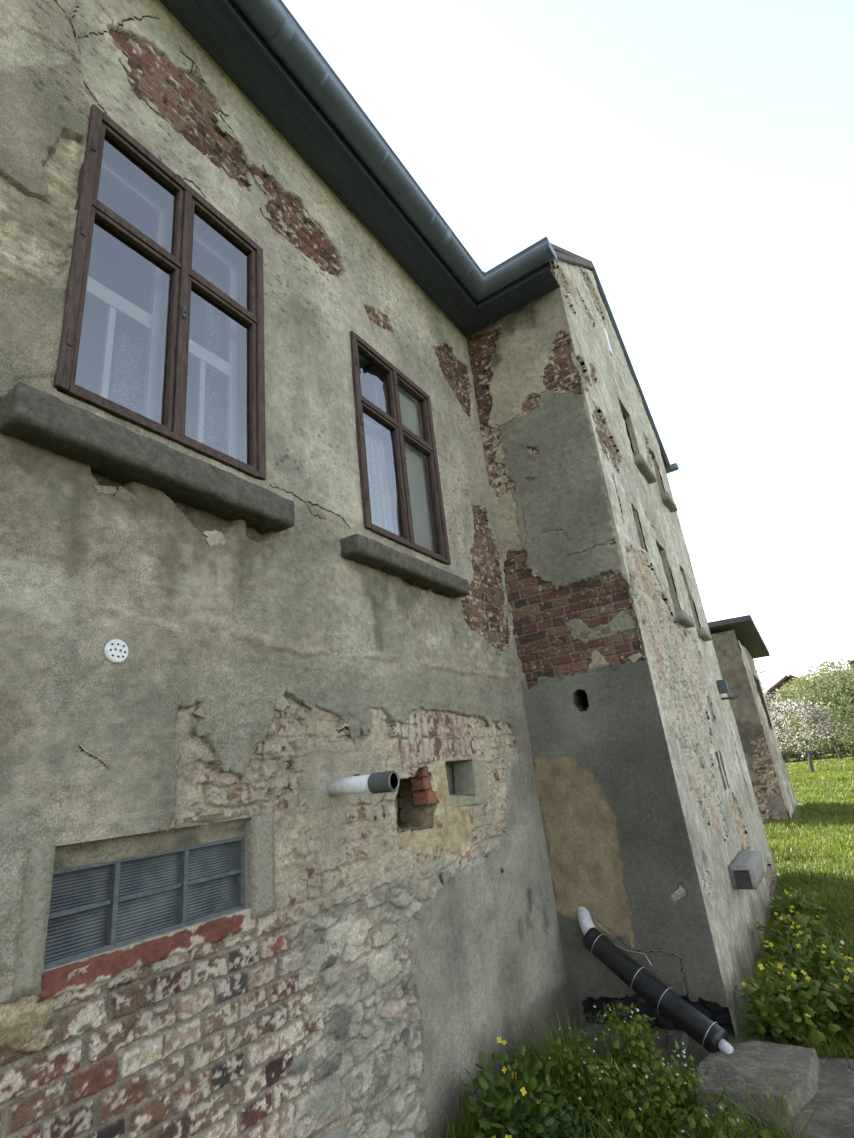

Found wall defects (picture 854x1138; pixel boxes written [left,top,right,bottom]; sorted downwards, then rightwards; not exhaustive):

crack [54,0,160,53]
crack [83,80,107,114]
spalling [108,27,343,277]
spalling [364,305,393,332]
spalling [433,325,534,498]
spalling [521,332,596,415]
spalling [592,406,620,473]
crack [269,484,351,529]
flaking render [461,503,749,851]
leakage [534,756,635,949]
flaking render [0,695,519,1138]